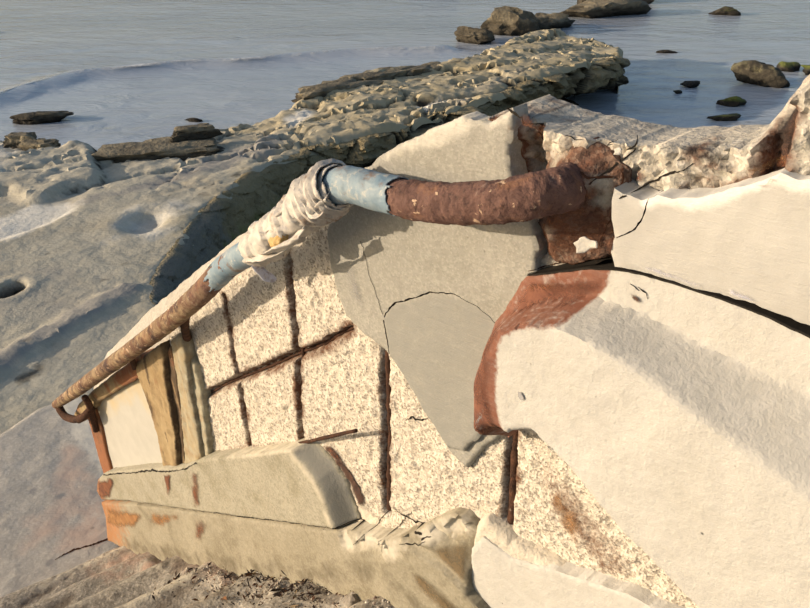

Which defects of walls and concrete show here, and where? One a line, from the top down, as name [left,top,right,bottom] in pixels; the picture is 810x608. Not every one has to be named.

spalling [488,74,810,191]
crack [527,135,810,338]
crack [360,241,495,352]
rust [510,284,595,316]
spalling [168,225,699,608]
rust [474,325,503,435]
rust [99,479,113,497]
rust [107,510,139,526]
crack [194,509,431,551]
rust [325,447,364,505]